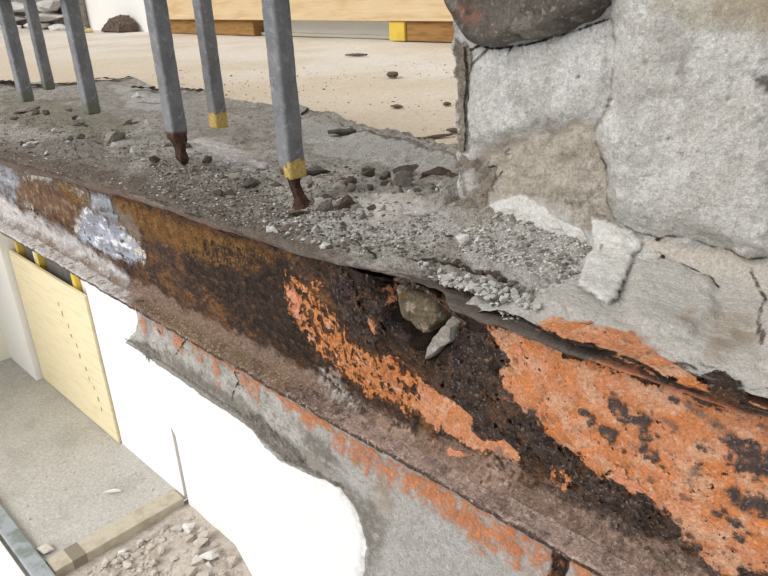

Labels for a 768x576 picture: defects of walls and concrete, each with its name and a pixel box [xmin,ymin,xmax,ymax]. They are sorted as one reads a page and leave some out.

spalling [187,137,268,169]
spalling [301,38,612,230]
peeling [0,164,146,264]
water stain [0,195,147,301]
rust [114,196,420,434]
crack [699,241,767,344]
rust [139,312,552,569]
rust [578,391,665,470]
rust [668,395,768,544]
rust [528,477,768,576]